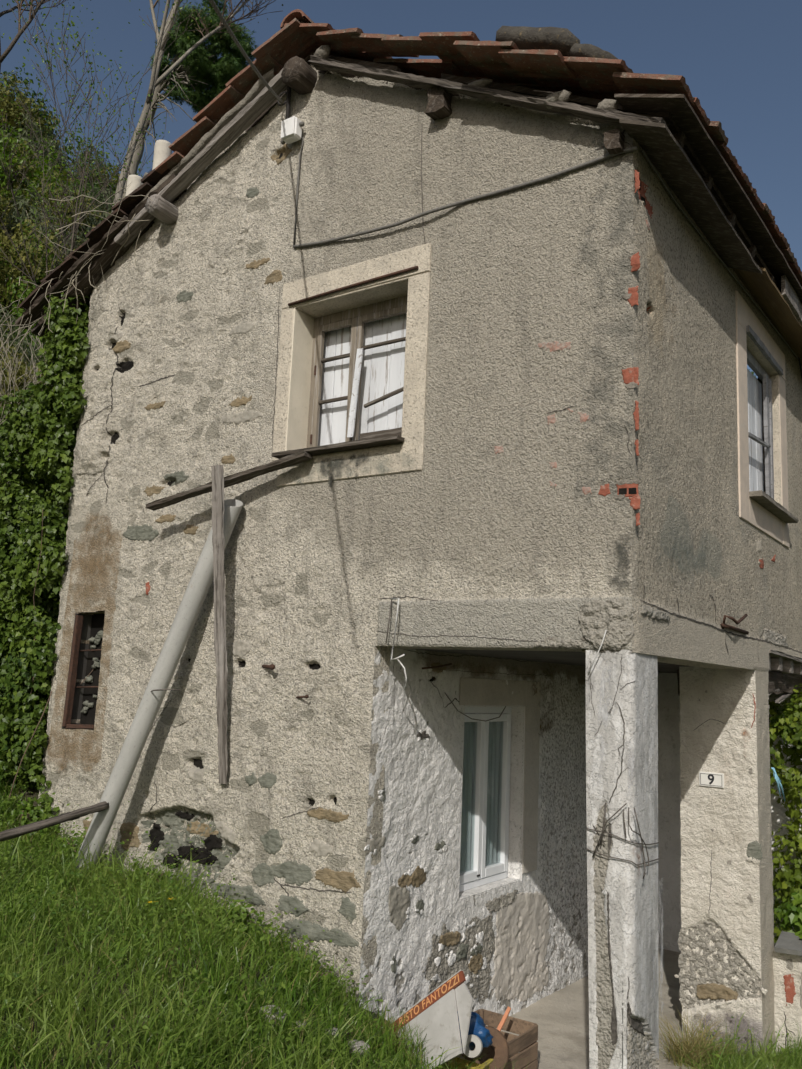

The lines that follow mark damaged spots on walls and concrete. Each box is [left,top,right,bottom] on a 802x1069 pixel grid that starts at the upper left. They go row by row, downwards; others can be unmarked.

flaking render [634,163,653,218]
flaking render [630,252,641,272]
flaking render [621,286,651,313]
flaking render [621,367,639,456]
spalling [534,598,671,653]
corrosion [720,614,749,635]
peeling [422,889,549,1011]
spalling [593,801,659,1069]
flaking render [674,919,768,1009]
flaking render [783,972,796,1008]